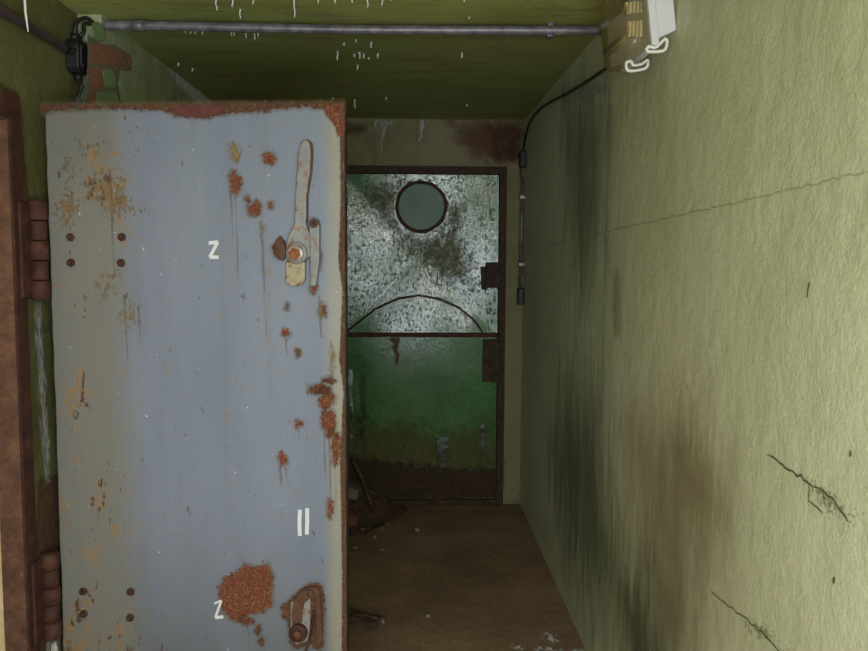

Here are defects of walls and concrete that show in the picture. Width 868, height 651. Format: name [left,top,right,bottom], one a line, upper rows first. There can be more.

flaking render [82,22,132,107]
corrosion [37,100,346,651]
crack [766,454,860,527]
crack [711,591,789,651]